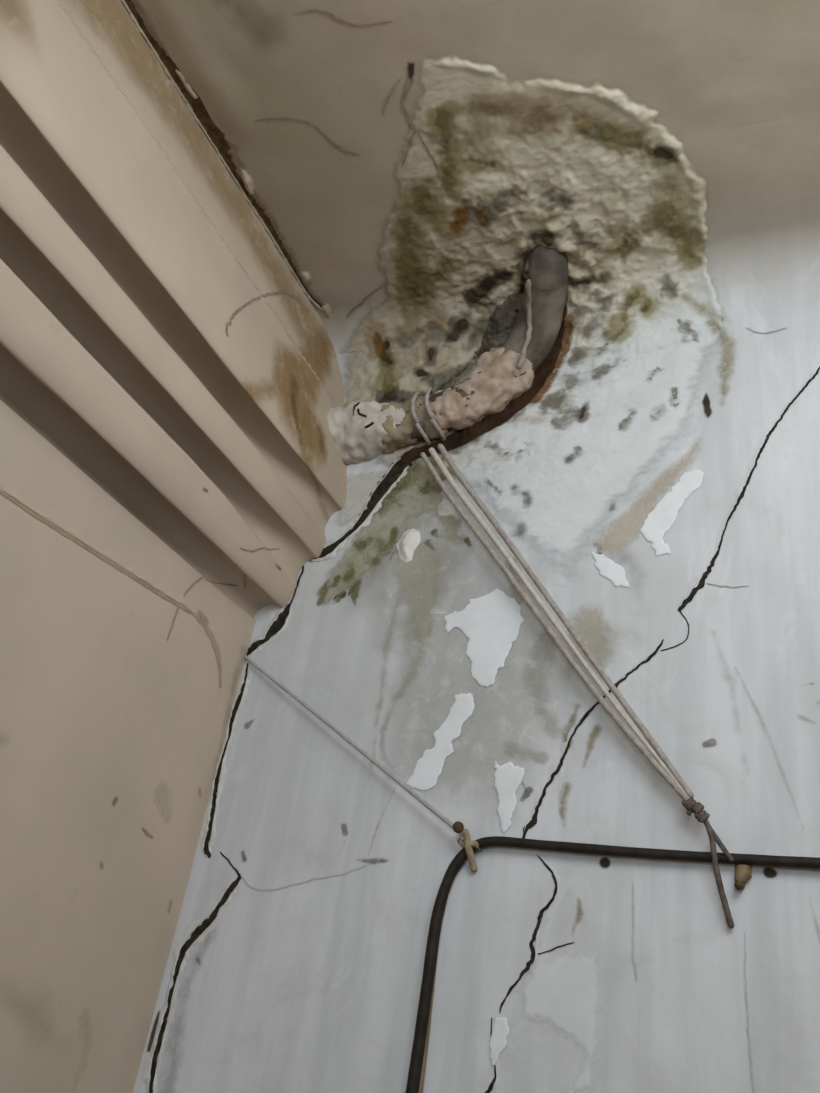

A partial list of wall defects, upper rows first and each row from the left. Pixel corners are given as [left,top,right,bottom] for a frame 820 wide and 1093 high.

leakage [84,0,321,347]
crack [120,0,393,336]
spalling [341,57,727,588]
leakage [701,308,733,393]
leakage [317,445,471,637]
leakage [599,460,688,551]
crack [142,456,412,1093]
peeling [406,588,524,790]
peeling [494,761,525,837]
crack [485,361,820,1093]
peeling [489,1017,510,1066]
peeling [523,956,599,1093]